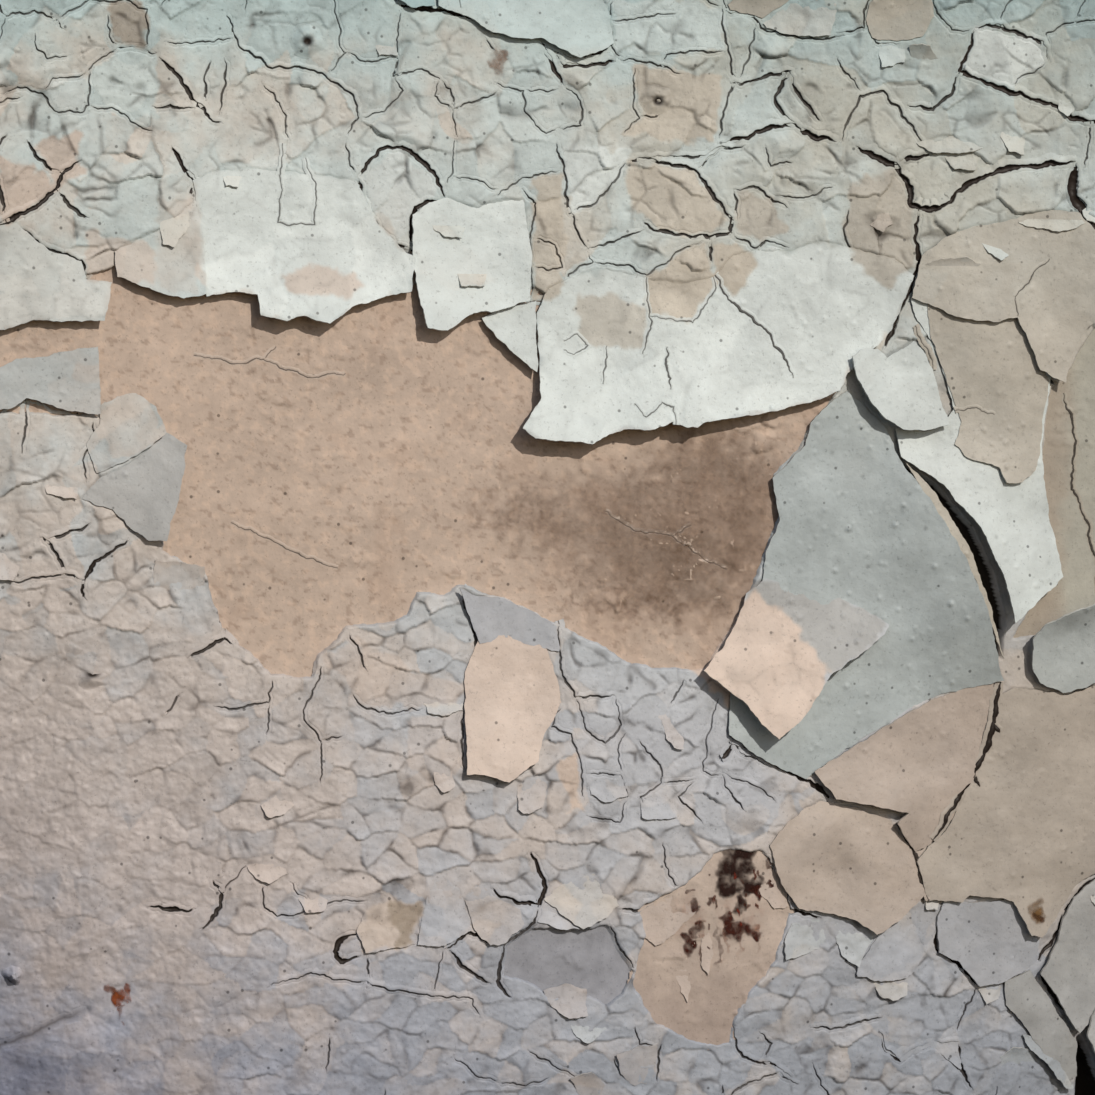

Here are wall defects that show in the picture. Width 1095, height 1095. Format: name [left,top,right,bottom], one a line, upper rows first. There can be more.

crack [0,0,1095,425]
peeling [0,168,914,783]
crack [6,520,131,603]
rust [104,983,130,1011]
peeling [261,795,294,818]
peeling [298,895,328,913]
crack [266,849,550,1018]
peeling [357,879,524,953]
crack [549,619,834,825]
rust [681,849,774,960]
peeling [504,208,1095,1086]
crack [810,681,1004,1095]